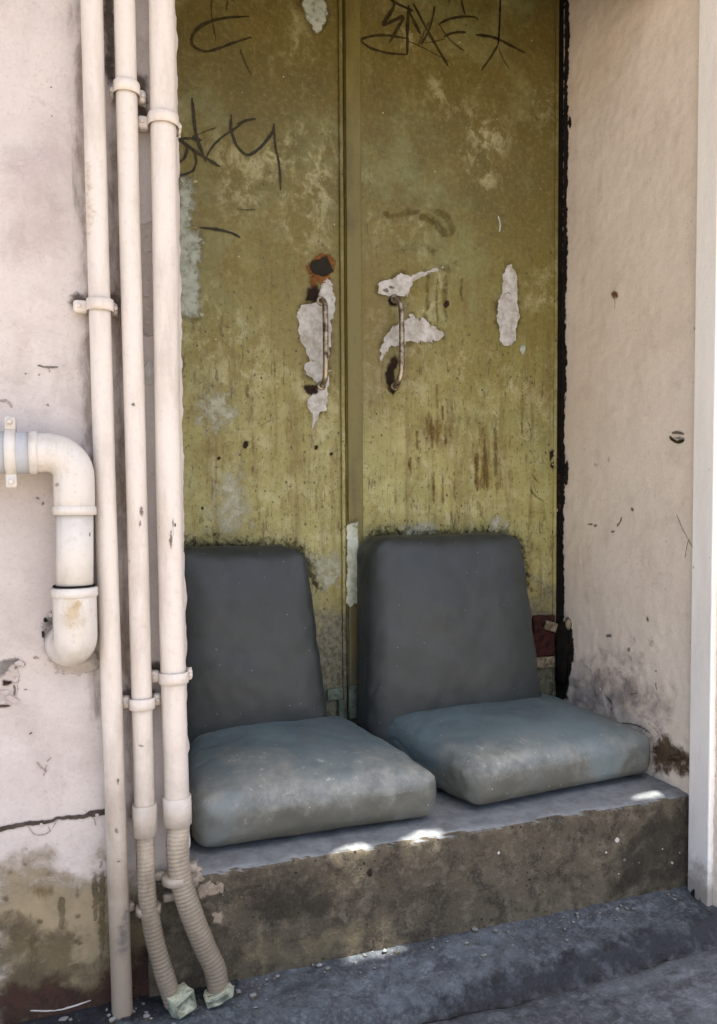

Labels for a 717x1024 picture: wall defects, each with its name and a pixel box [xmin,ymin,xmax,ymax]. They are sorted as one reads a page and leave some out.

peeling [179,176,204,318]
peeling [296,279,336,428]
rust [305,253,335,302]
peeling [376,266,444,297]
peeling [379,314,444,361]
peeling [495,264,525,354]
water stain [559,0,663,733]
rust [474,429,496,491]
flaking render [0,612,53,708]
crack [0,809,105,836]
water stain [0,851,169,1024]
water stain [193,987,207,1001]